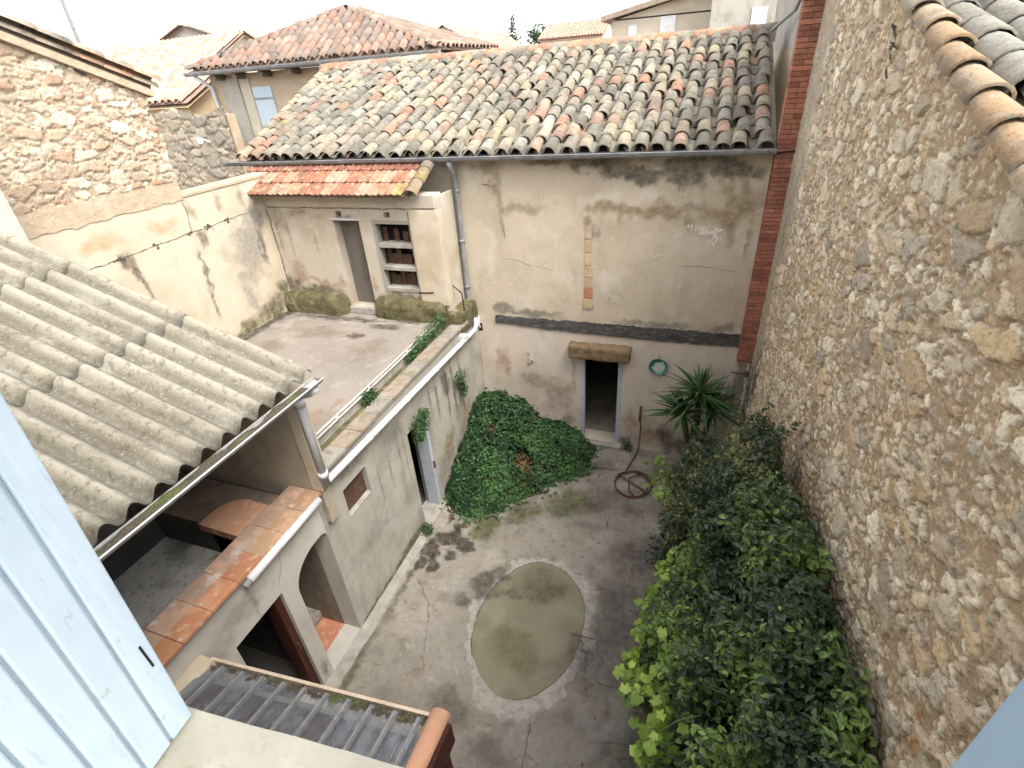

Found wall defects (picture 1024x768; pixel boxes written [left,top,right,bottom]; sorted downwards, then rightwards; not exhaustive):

leakage [572,156,758,185]